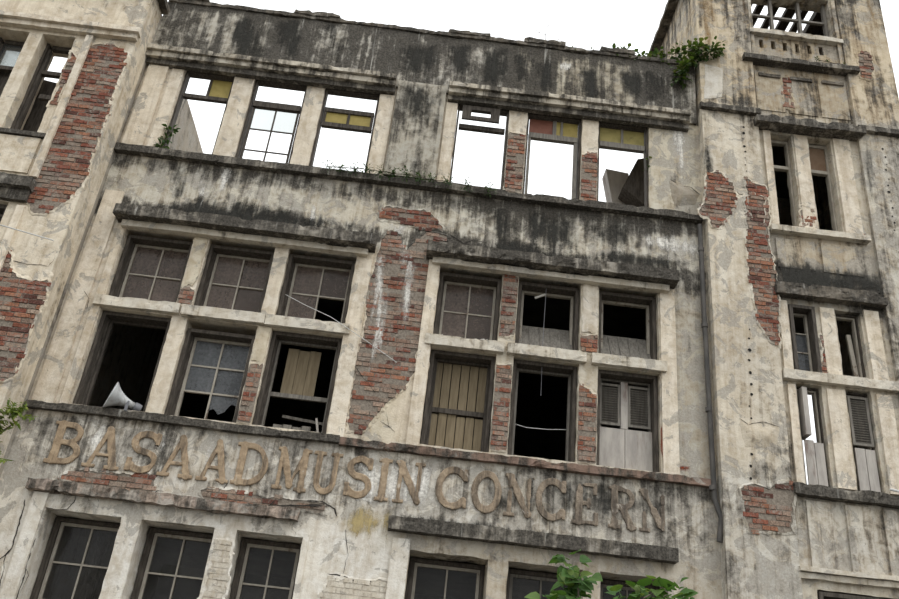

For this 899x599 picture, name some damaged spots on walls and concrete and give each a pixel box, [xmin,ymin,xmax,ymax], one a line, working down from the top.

water stain [232,19,261,57]
water stain [581,70,602,98]
spalling [25,42,130,216]
water stain [164,167,334,227]
water stain [493,210,578,258]
water stain [599,225,697,268]
spalling [697,170,782,349]
spalling [0,249,54,384]
spalling [345,205,451,435]
spalling [738,480,797,536]
crack [0,496,99,599]
peeling [197,536,235,599]